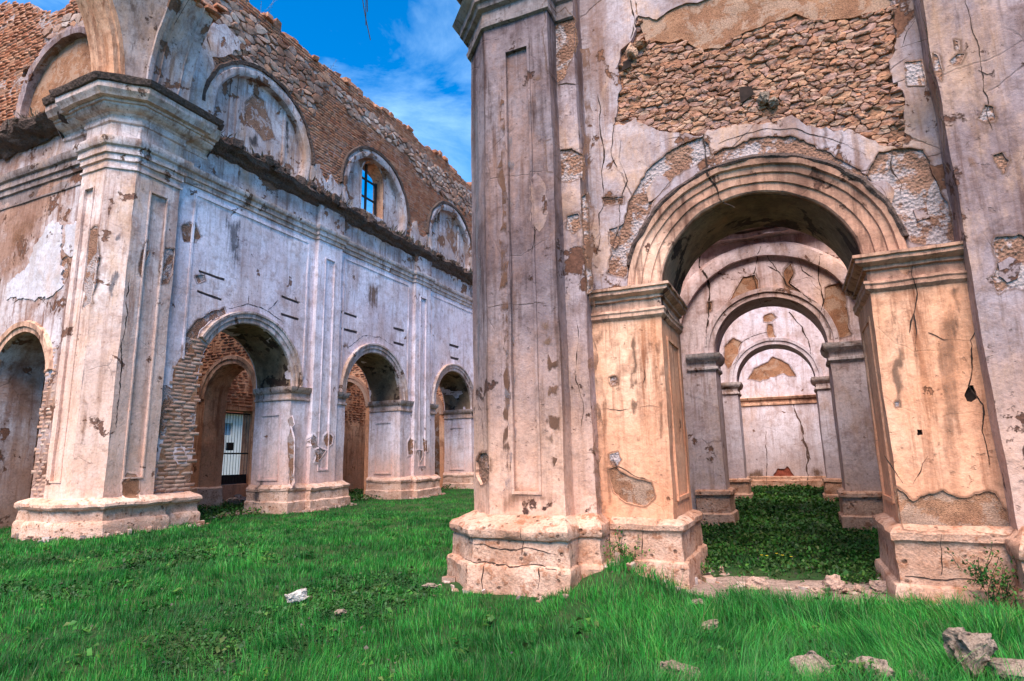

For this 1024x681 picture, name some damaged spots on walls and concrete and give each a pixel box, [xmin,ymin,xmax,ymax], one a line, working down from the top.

crack [965,3,992,128]
damp [497,99,514,290]
crack [547,73,628,253]
spalling [602,135,955,278]
spalling [991,234,1024,295]
flaking render [120,307,230,501]
spalling [475,451,490,486]
damp [503,334,515,450]
spalling [608,452,656,507]
spalling [749,357,796,382]
crack [793,404,810,484]
crack [909,265,990,465]